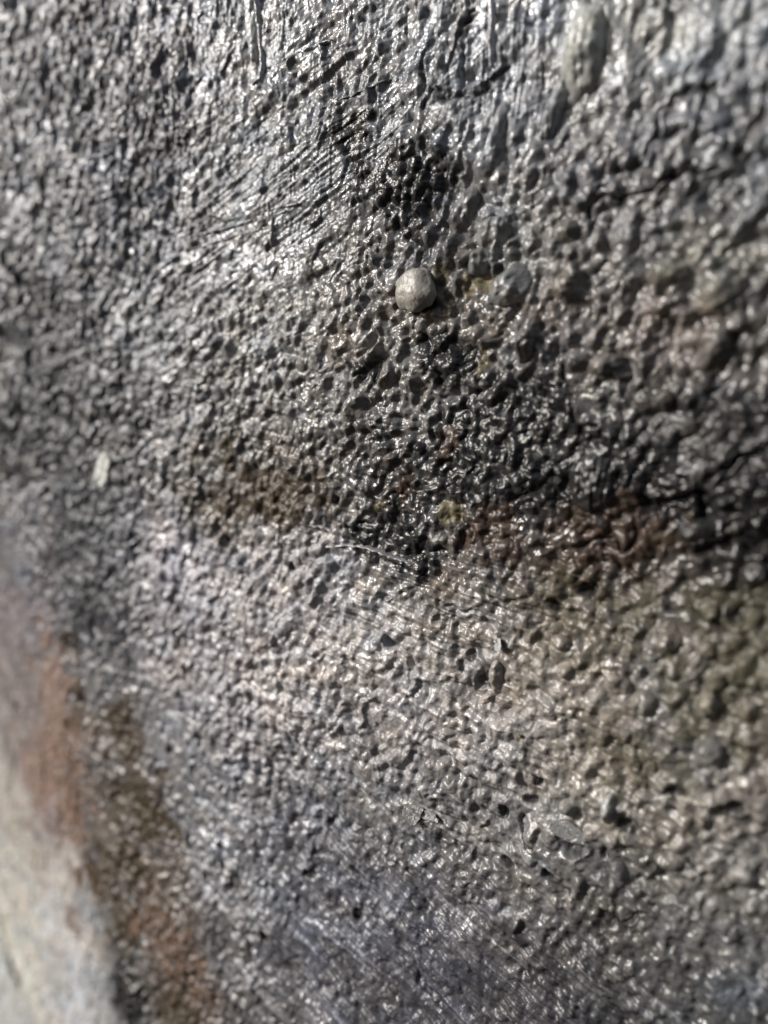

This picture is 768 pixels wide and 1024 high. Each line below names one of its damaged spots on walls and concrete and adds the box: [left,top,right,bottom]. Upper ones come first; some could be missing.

corrosion [455,502,523,568]
corrosion [541,486,688,590]